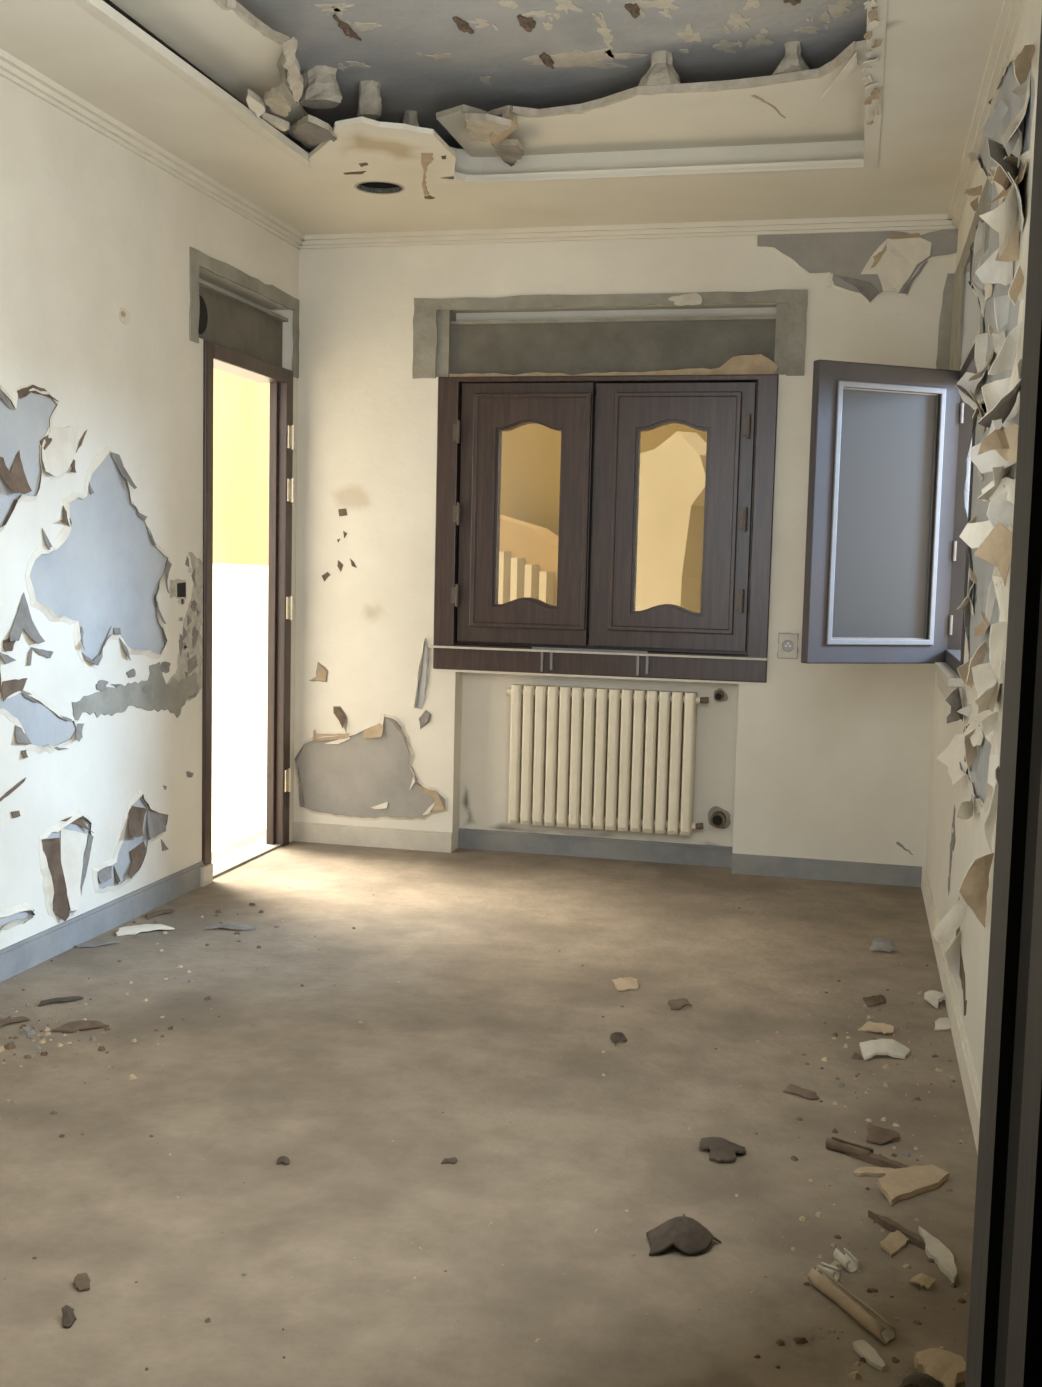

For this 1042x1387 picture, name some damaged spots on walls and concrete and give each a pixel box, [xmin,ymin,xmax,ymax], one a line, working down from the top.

peeling [0,384,203,759]
peeling [755,41,1039,989]
peeling [0,778,26,818]
peeling [0,789,168,933]
peeling [294,638,448,821]